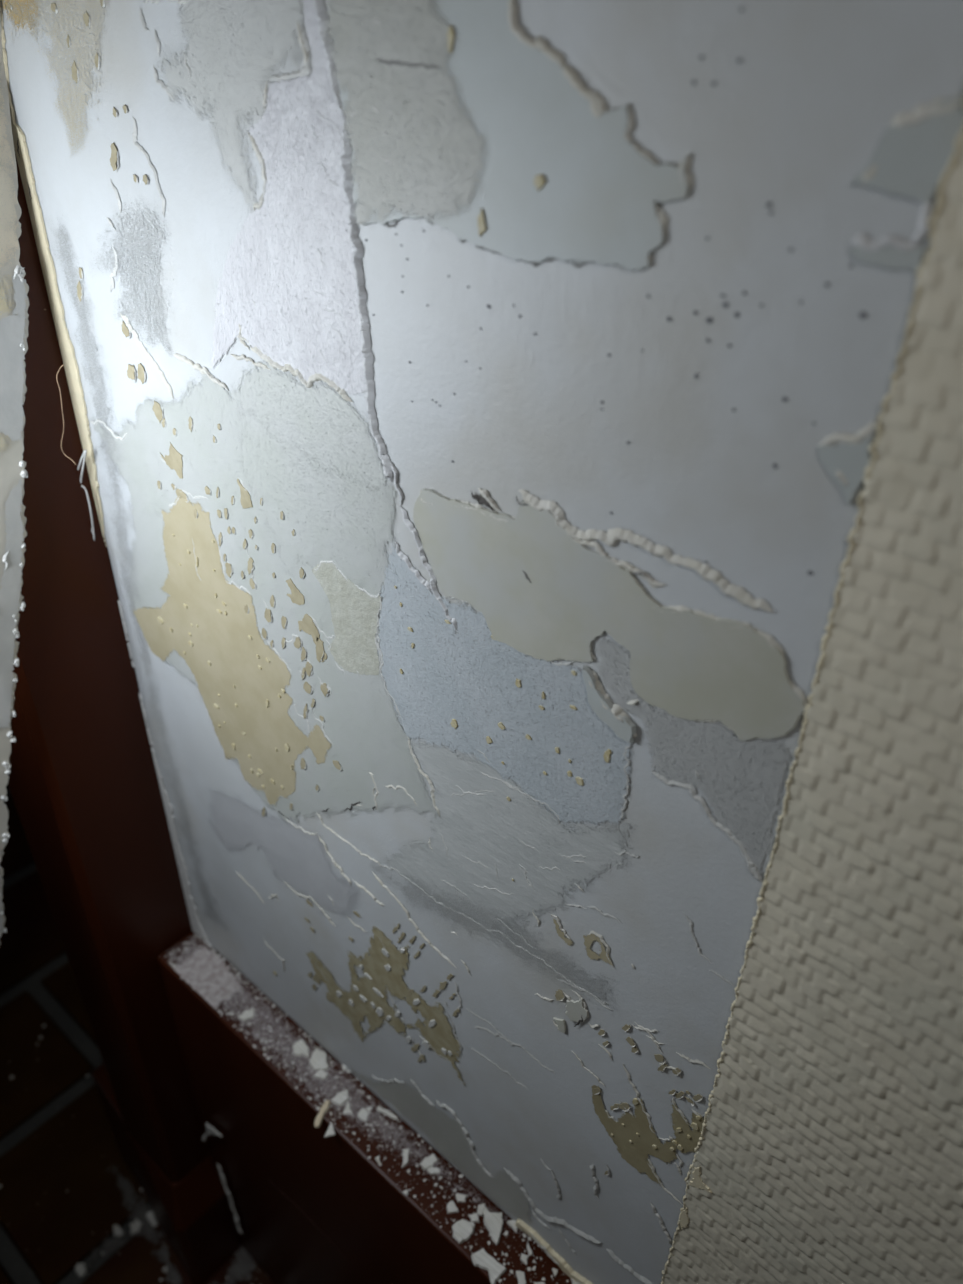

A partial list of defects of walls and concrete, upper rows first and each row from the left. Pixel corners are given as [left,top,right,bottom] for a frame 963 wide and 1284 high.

peeling [238,1008,255,1022]
peeling [292,1039,329,1080]
peeling [314,1089,372,1128]
peeling [377,1106,399,1121]
peeling [202,1123,222,1142]
peeling [420,1154,440,1175]
peeling [447,1193,467,1214]
peeling [452,1203,503,1245]
peeling [520,1241,533,1265]
peeling [471,1248,506,1284]
peeling [516,1271,526,1284]